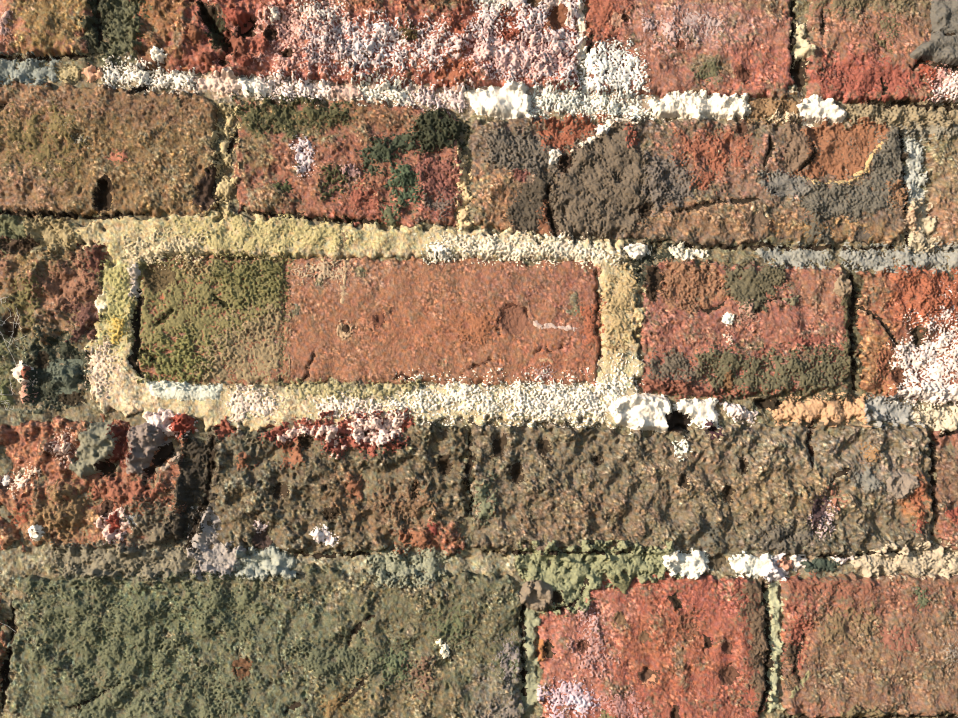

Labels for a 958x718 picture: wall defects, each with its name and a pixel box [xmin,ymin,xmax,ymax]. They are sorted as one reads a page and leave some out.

leakage [80,0,753,231]
efflorescence [884,282,958,408]